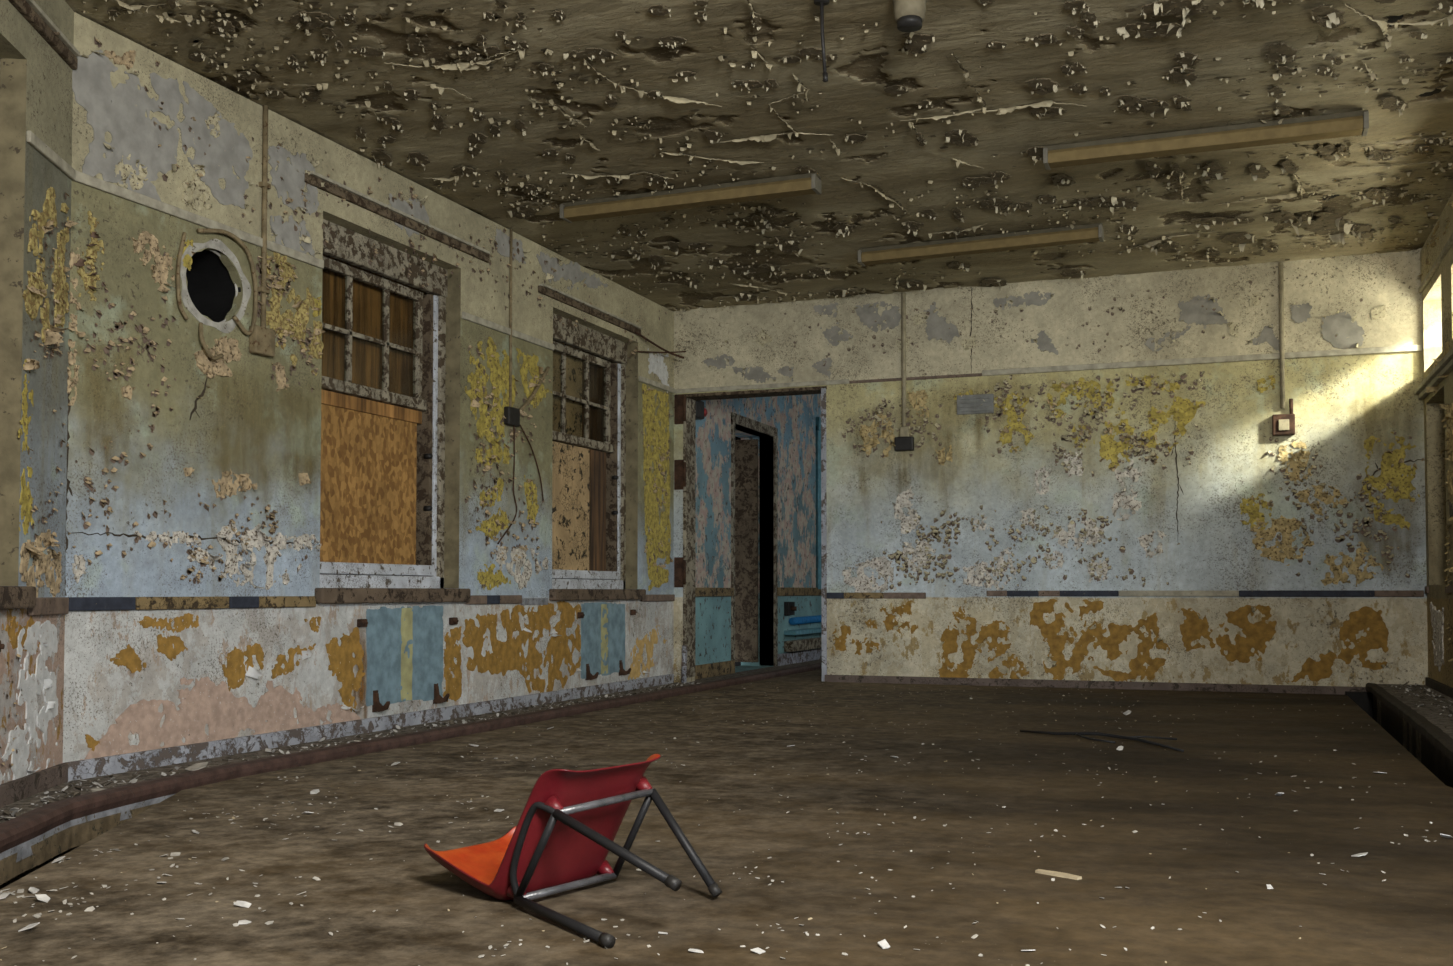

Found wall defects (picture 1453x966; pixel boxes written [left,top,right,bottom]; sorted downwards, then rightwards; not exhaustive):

peeling [18,0,1453,597]
peeling [80,336,701,760]
peeling [1288,606,1389,682]
peeling [1425,341,1453,672]
peeling [28,887,50,903]